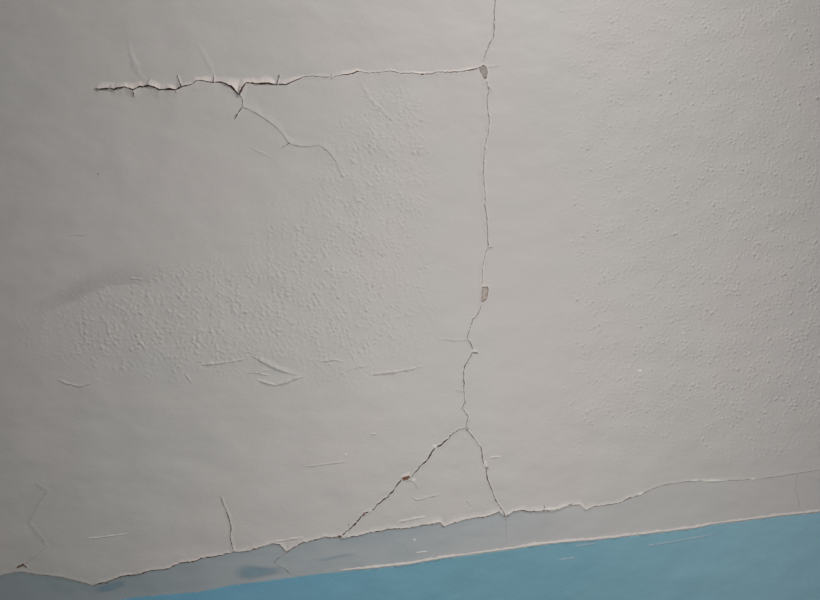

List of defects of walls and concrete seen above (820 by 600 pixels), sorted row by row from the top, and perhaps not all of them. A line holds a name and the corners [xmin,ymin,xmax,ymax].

crack [480,0,499,69]
crack [92,66,820,586]
peeling [0,470,820,600]